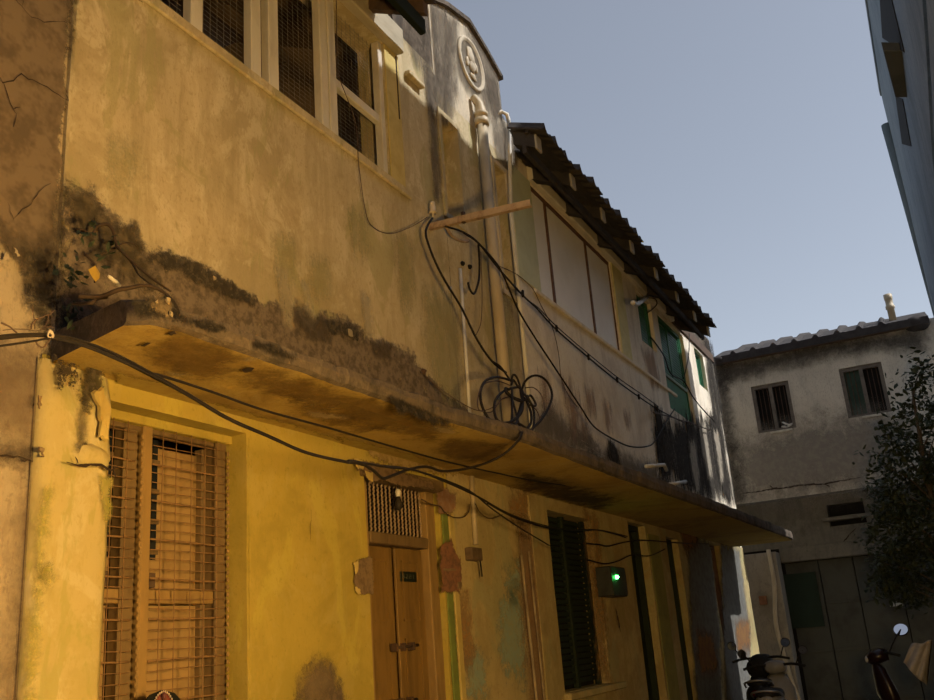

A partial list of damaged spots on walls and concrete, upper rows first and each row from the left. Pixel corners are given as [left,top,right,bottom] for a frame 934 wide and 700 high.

crack [1,73,69,127]
water stain [0,184,468,450]
water stain [529,330,925,506]
crack [0,454,33,462]
water stain [443,439,505,462]
crack [742,477,860,494]
peeling [353,557,374,595]
spalling [440,538,487,699]